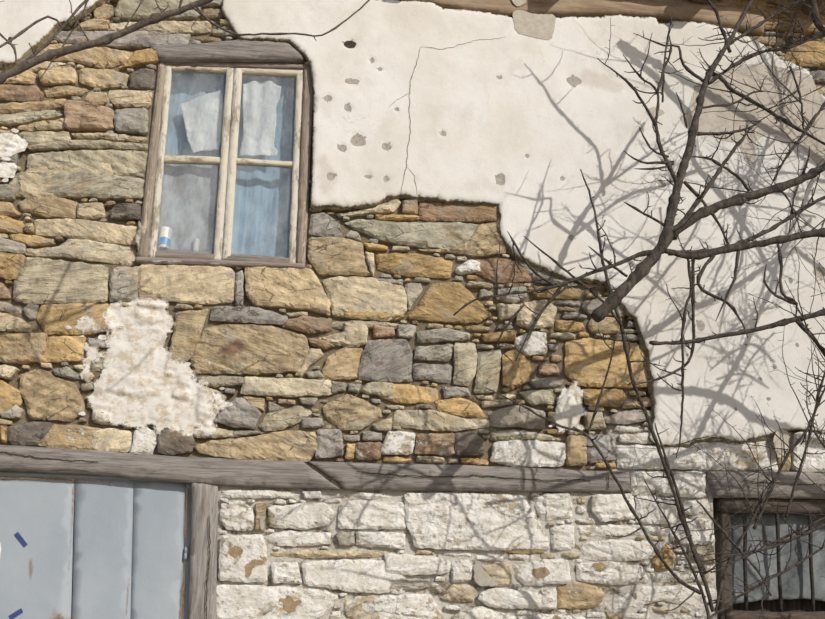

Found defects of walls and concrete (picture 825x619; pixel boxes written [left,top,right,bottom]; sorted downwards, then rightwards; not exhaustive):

flaking render [0,0,110,70]
flaking render [220,2,292,45]
flaking render [337,133,366,152]
crack [390,37,502,190]
flaking render [566,74,582,87]
flaking render [681,64,825,176]
flaking render [310,195,610,294]
flaking render [619,304,655,445]